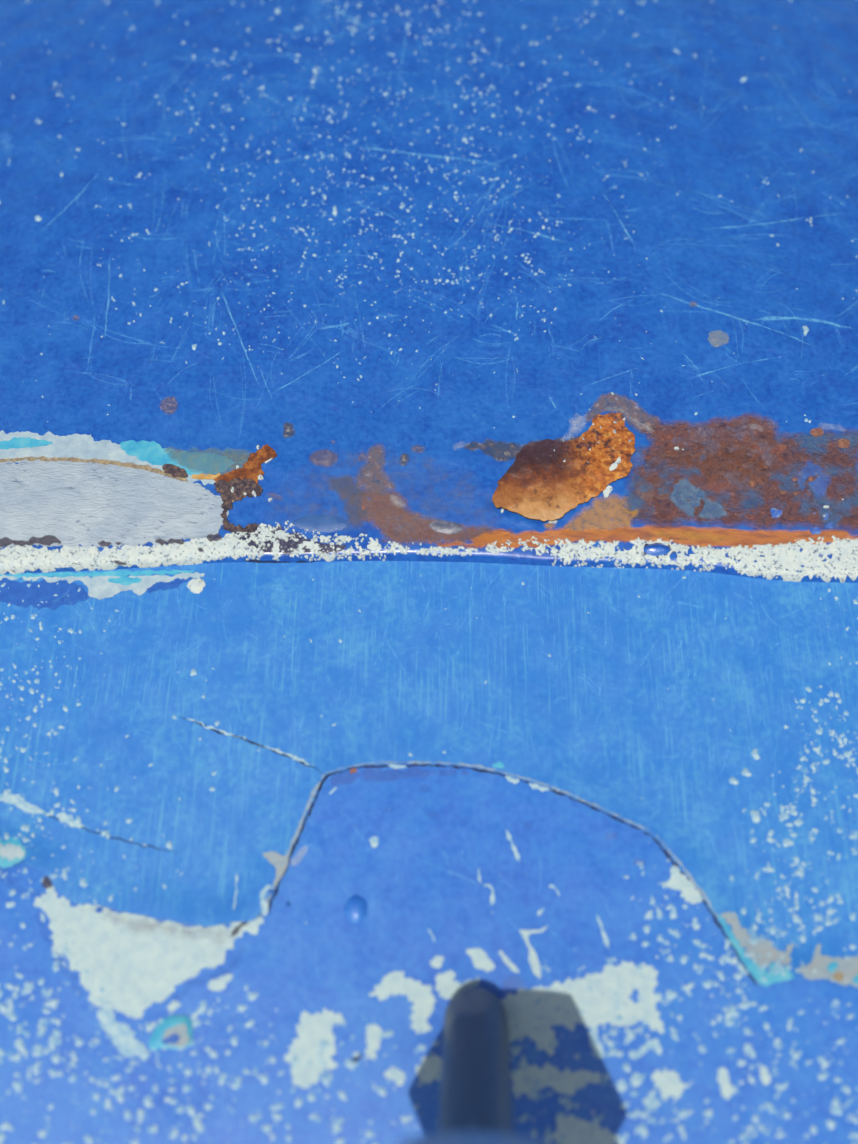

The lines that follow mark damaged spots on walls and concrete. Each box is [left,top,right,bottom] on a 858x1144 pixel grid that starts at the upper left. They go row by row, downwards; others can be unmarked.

corrosion [311,451,336,465]
corrosion [332,394,858,548]
peeling [0,421,858,1144]
crack [181,717,760,986]